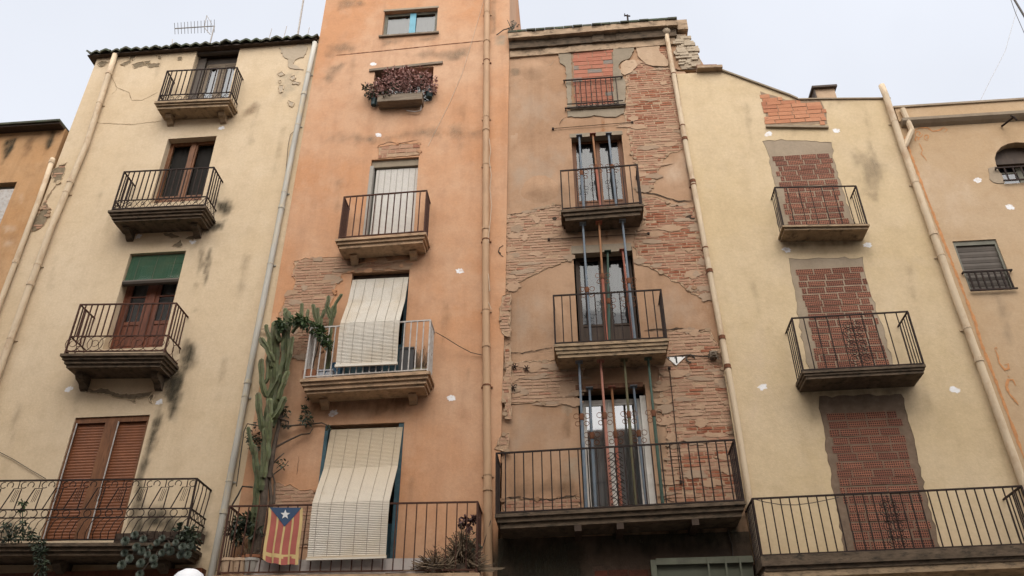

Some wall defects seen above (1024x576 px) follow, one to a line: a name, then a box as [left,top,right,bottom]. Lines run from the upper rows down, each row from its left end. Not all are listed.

spalling [97,56,162,69]
spalling [278,71,301,107]
peeling [378,142,422,159]
peeling [51,162,67,185]
peeling [616,46,712,301]
peeling [31,200,51,232]
peeling [261,256,413,360]
peeling [499,202,590,420]
water stain [141,344,193,471]